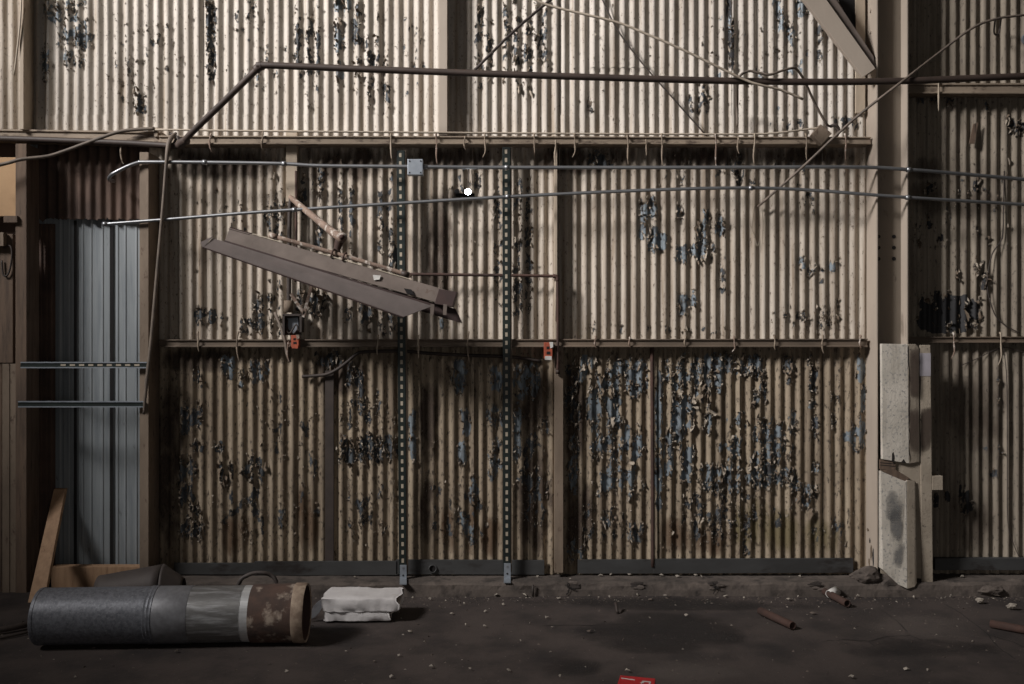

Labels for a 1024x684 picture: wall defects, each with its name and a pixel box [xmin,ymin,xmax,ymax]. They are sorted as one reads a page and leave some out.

peeling [41,0,426,125]
peeling [474,0,551,100]
peeling [607,0,830,132]
peeling [239,278,328,338]
peeling [417,165,534,333]
peeling [638,155,726,294]
peeling [760,224,849,335]
peeling [915,256,993,335]
peeling [177,353,321,545]
peeling [314,349,552,546]
peeling [563,349,854,565]
peeling [782,351,867,453]